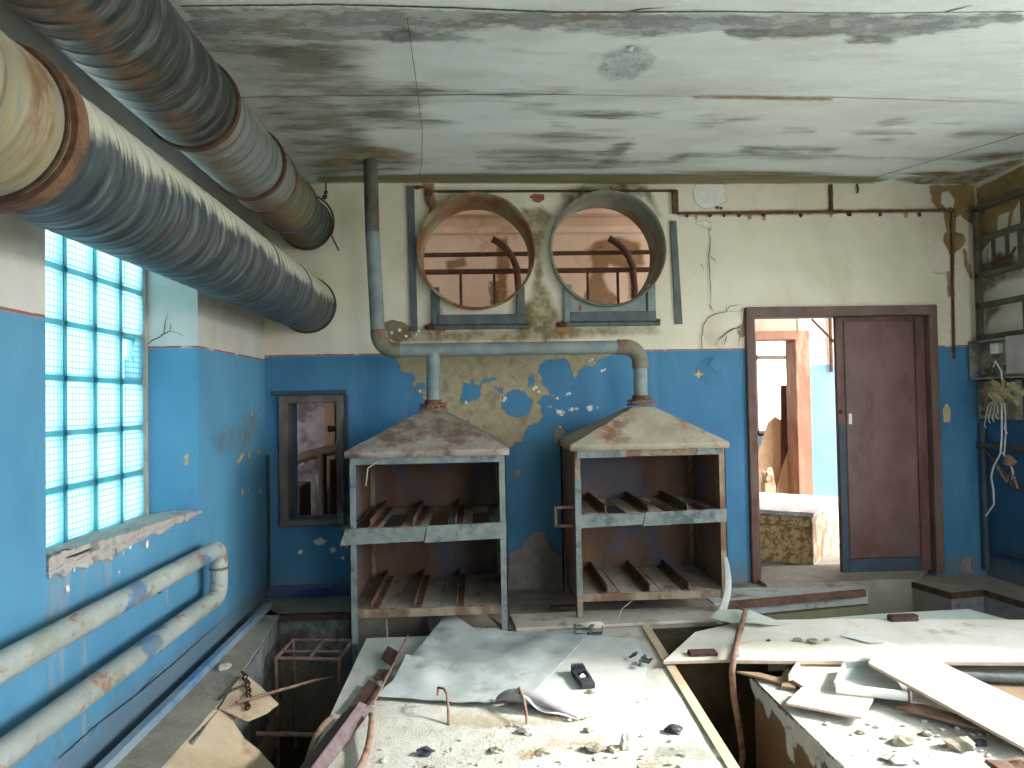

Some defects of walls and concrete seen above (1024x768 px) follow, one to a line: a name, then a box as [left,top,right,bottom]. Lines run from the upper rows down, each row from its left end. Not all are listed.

damp [187,8,1024,291]
damp [395,209,617,341]
crack [701,236,741,373]
peeling [396,354,612,448]
spalling [48,511,196,592]
peeling [508,530,563,590]